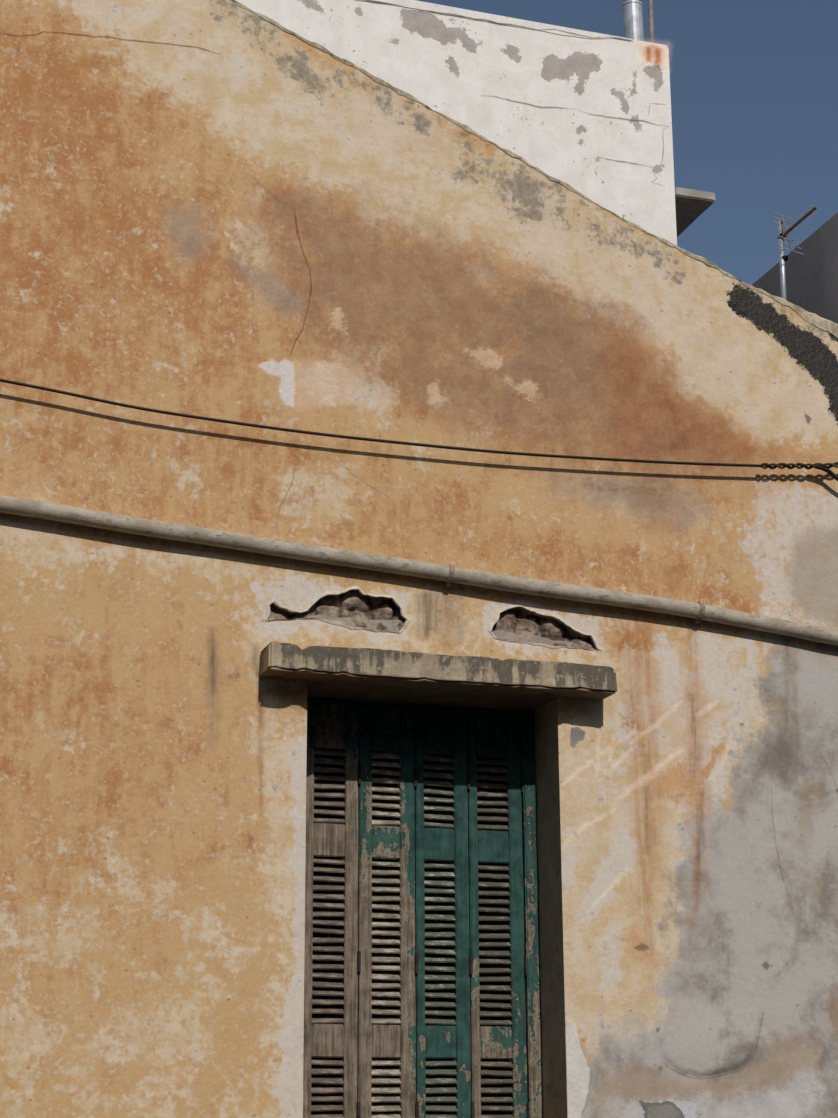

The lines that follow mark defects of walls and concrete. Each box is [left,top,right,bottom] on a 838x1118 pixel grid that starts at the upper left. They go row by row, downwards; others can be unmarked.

crack [0,31,220,54]
peeling [390,8,483,79]
peeling [541,51,603,96]
peeling [610,64,664,132]
rust [638,44,667,65]
crack [264,186,333,355]
water stain [228,186,797,531]
spalling [264,586,411,634]
spalling [487,605,602,651]
water stain [738,716,798,814]
peeling [566,1020,592,1118]
peeling [613,1072,826,1118]